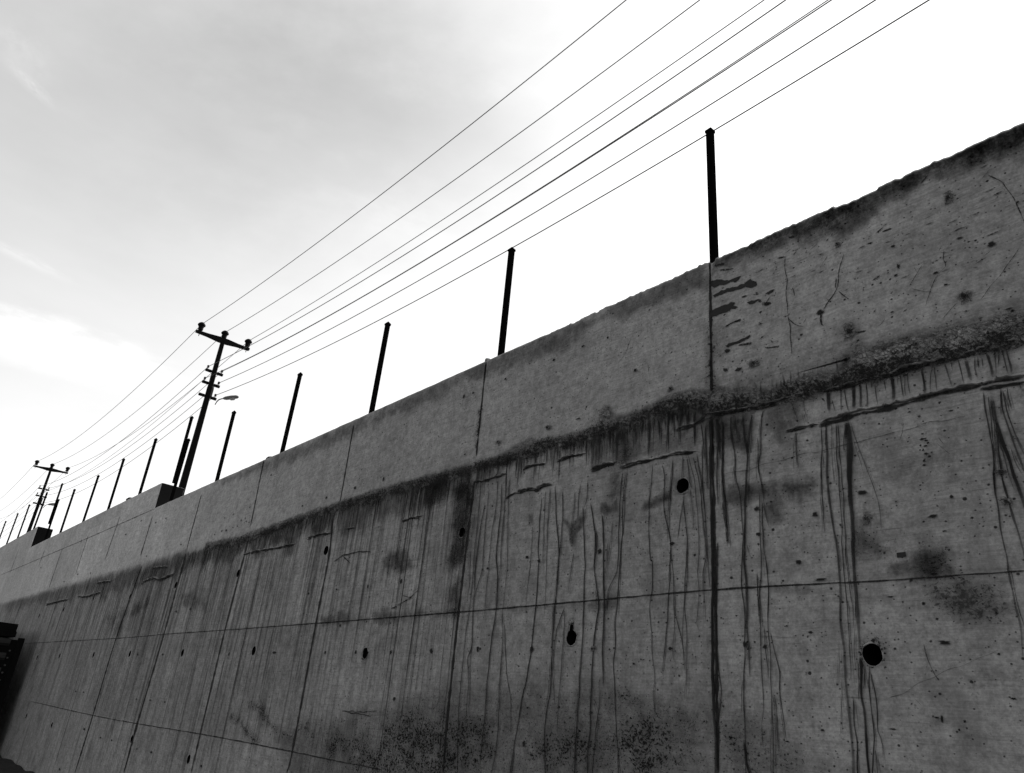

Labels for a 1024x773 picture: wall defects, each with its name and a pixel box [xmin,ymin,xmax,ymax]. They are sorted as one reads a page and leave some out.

crack [784,255,848,353]
crack [989,175,1024,221]
water stain [27,374,791,773]
water stain [784,348,1024,773]